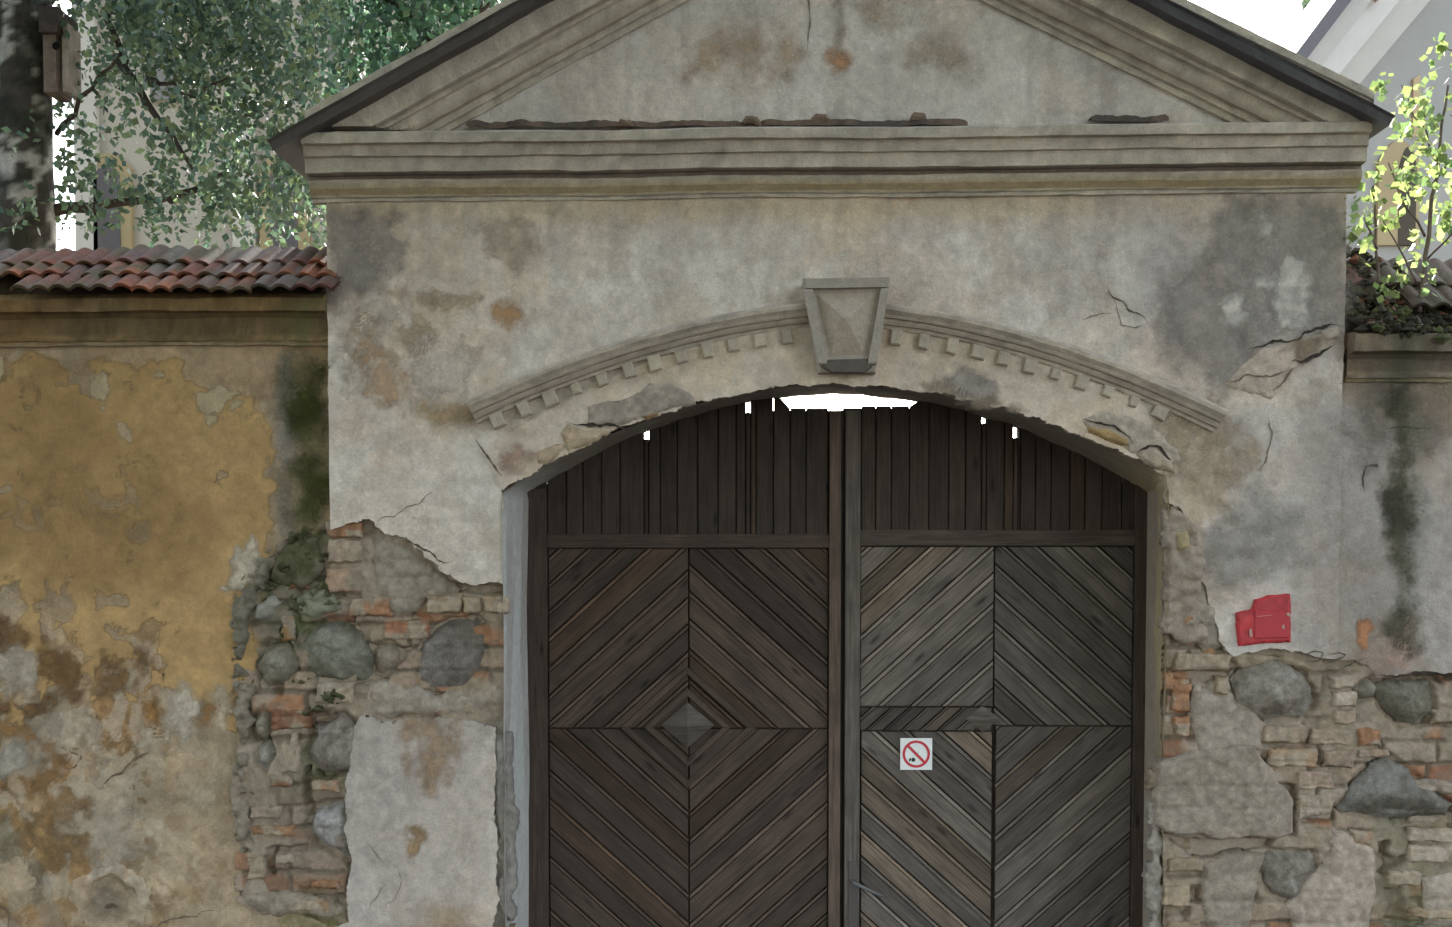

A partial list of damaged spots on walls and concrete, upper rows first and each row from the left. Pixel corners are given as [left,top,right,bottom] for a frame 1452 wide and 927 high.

flaking render [536,382,696,464]
flaking render [923,367,1021,412]
flaking render [1082,411,1180,474]
flaking render [1224,324,1340,399]
damp [1362,382,1443,583]
spalling [0,351,520,927]
damp [1380,608,1414,675]
spalling [1141,499,1452,927]